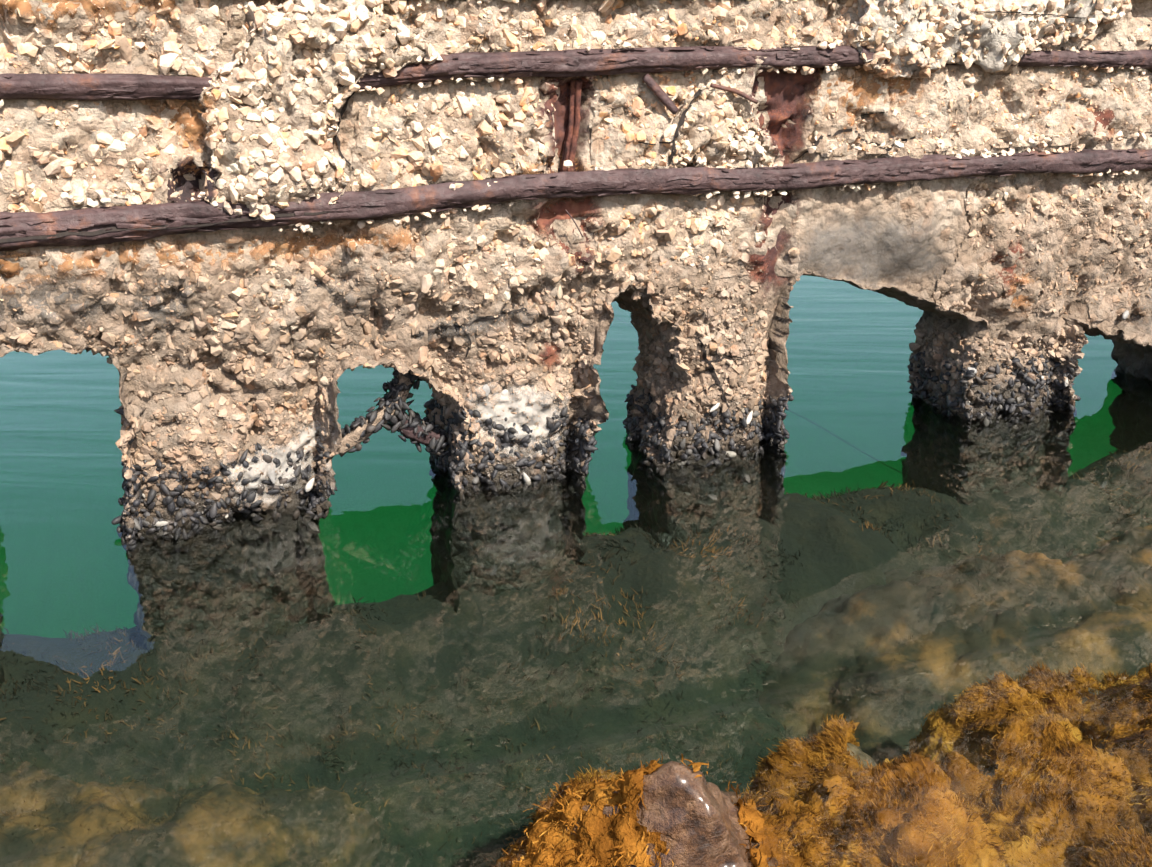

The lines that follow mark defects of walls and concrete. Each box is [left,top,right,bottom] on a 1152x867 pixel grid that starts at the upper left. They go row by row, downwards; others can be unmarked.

rust [522,75,595,174]
crack [638,89,702,167]
rust [750,66,935,164]
rust [531,196,599,273]